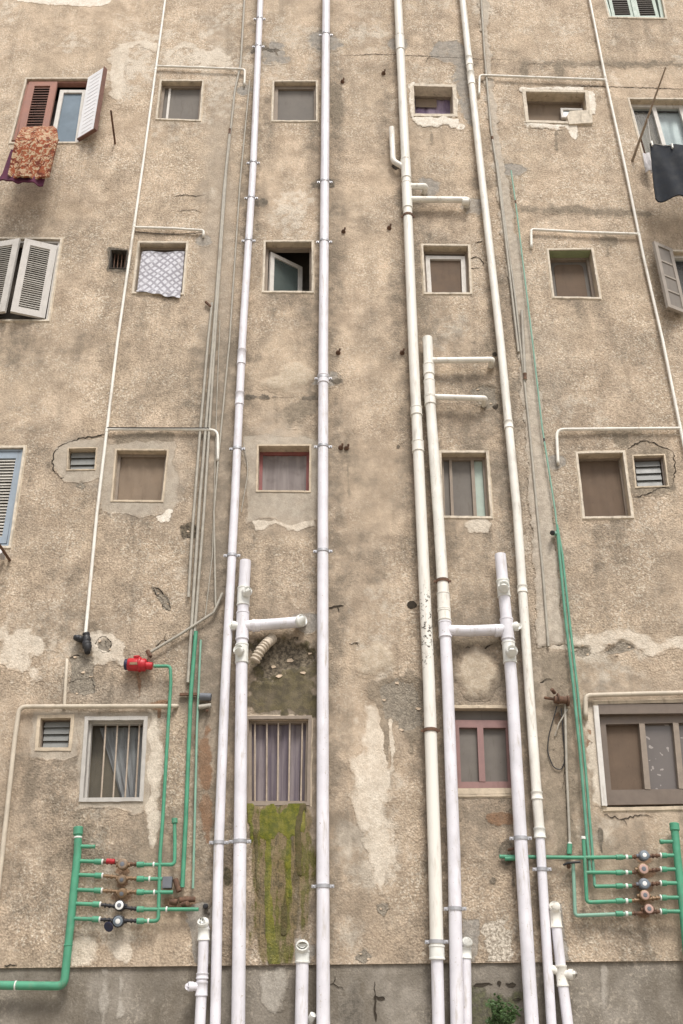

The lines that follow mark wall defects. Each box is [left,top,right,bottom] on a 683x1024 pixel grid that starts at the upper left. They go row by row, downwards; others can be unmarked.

crack [51,434,105,476]
crack [628,440,676,497]
flaking render [156,509,196,539]
flaking render [252,519,317,532]
flaking render [151,587,171,611]
crack [374,981,385,1021]